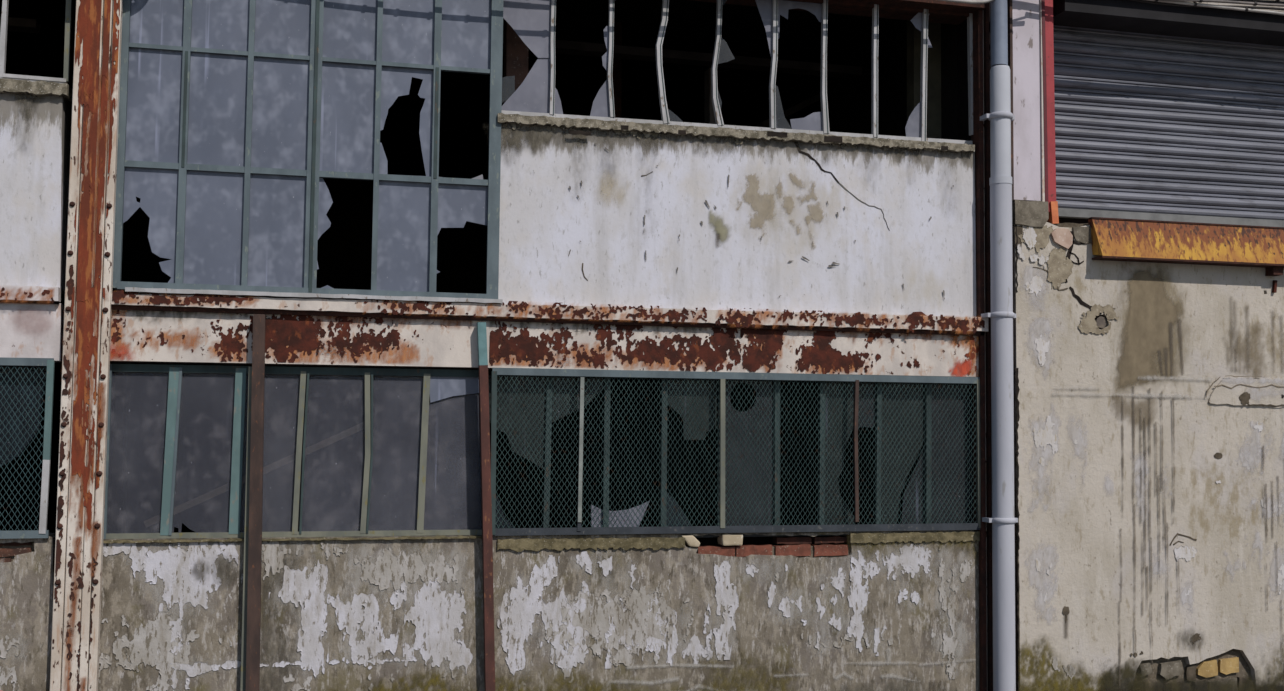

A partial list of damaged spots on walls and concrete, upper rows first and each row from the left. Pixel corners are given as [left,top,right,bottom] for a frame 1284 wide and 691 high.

crack [794,142,890,231]
corrosion [0,287,54,303]
corrosion [67,0,985,691]
spalling [1014,222,1092,376]
spalling [0,541,34,563]
peeling [52,355,241,691]
peeling [260,541,473,691]
water stain [602,664,723,691]
peeling [497,536,972,689]
water stain [1054,271,1211,678]
spalling [1131,633,1256,691]
water stain [1263,446,1279,549]